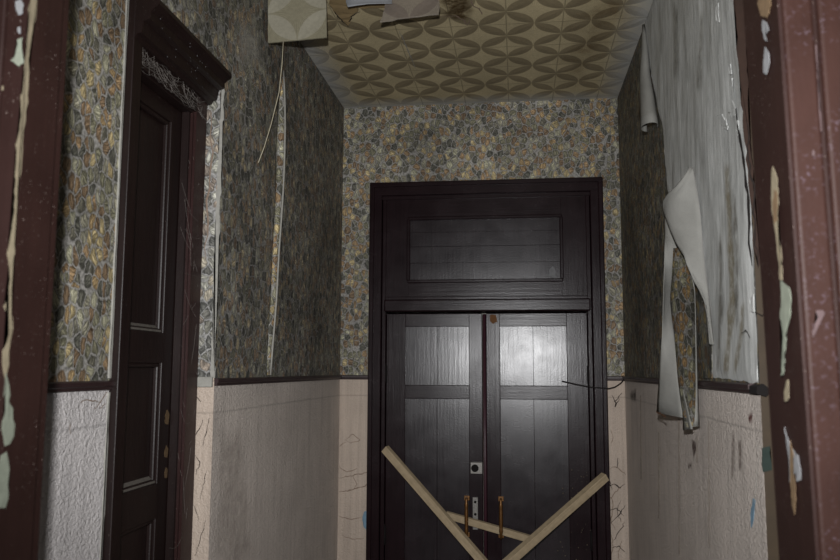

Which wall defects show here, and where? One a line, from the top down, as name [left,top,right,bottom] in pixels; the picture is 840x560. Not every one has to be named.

peeling [757,0,771,75]
peeling [0,0,37,508]
peeling [645,0,758,383]
peeling [771,166,791,402]
peeling [812,310,825,337]
crack [609,431,626,559]
peeling [762,446,772,472]
peeling [784,427,801,515]